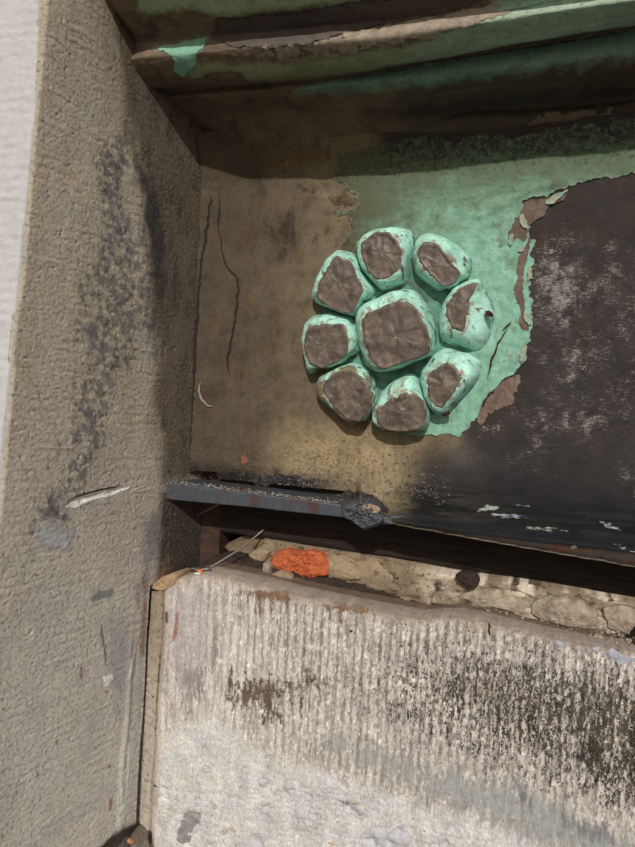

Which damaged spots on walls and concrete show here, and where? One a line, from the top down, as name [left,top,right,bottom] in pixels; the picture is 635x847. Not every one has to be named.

peeling [158,37,207,77]
crack [189,196,240,461]
peeling [508,189,568,330]
water stain [181,666,213,705]
water stain [225,609,635,847]